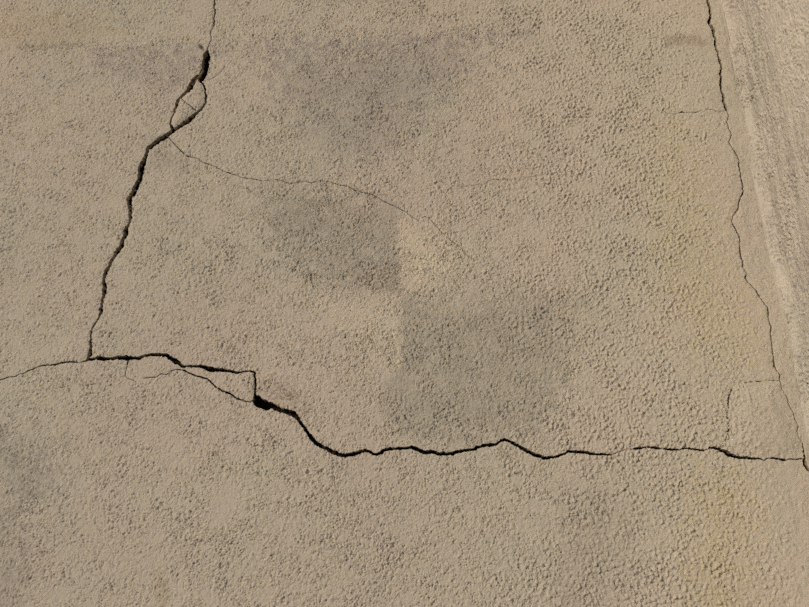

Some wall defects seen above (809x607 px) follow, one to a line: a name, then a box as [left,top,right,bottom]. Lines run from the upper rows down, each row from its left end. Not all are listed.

crack [0,0,475,404]
crack [278,0,809,471]